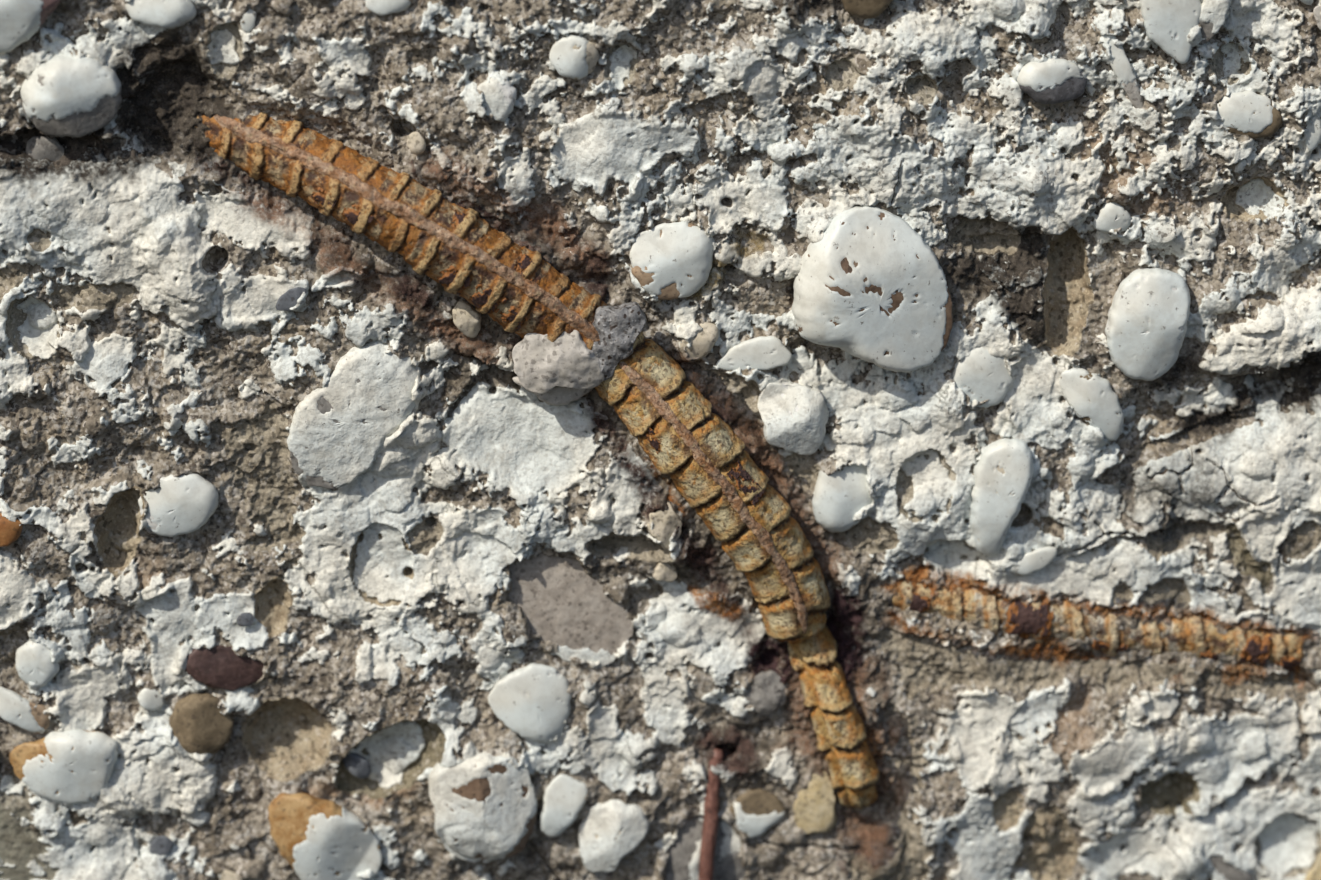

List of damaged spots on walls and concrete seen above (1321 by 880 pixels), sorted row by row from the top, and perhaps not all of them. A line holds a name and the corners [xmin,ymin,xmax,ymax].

peeling [0,147,367,332]
corrosion [194,112,608,365]
corrosion [694,233,764,298]
peeling [815,114,1106,238]
peeling [1199,228,1321,375]
peeling [38,577,269,880]
peeling [212,382,662,622]
corrosion [585,331,892,867]
peeling [673,356,980,560]
spalling [847,626,1321,880]
corrosion [886,565,1313,684]
peeling [976,339,1321,637]